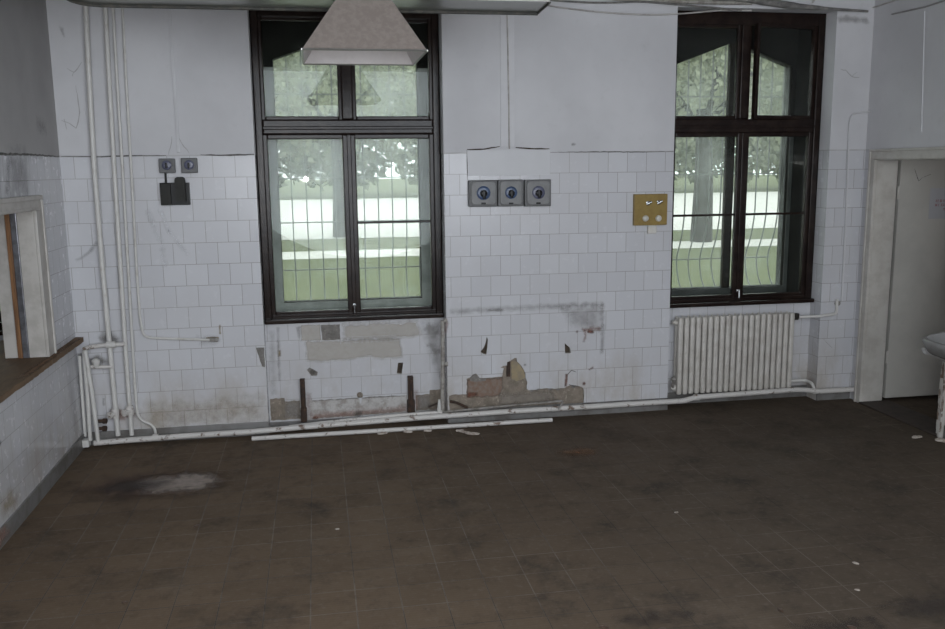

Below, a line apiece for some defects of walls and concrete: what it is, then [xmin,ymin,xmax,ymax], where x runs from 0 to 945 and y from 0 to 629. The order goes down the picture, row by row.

peeling [321,324,340,340]
spalling [449,358,584,410]